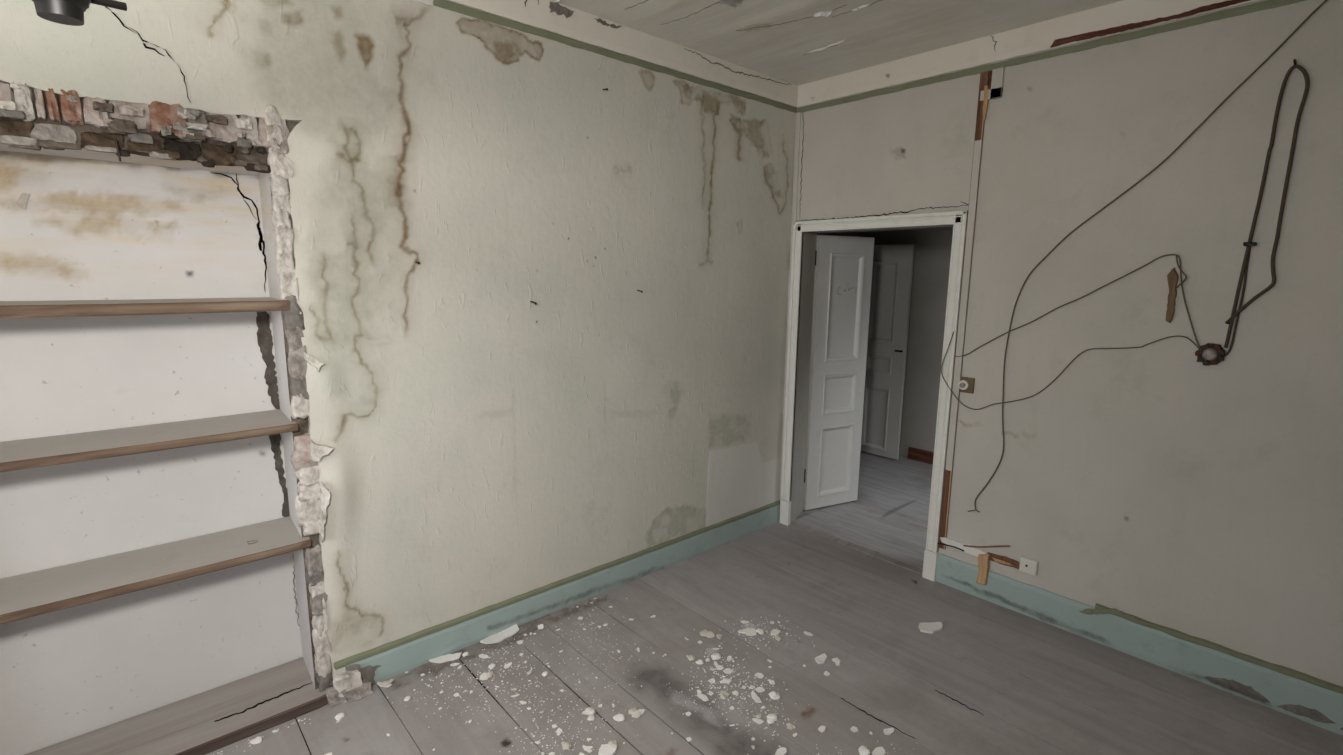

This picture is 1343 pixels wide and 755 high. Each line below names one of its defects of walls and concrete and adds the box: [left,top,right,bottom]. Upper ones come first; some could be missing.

crack [103,6,191,103]
damp [358,37,373,63]
crack [624,0,790,85]
crack [736,0,882,55]
damp [397,52,410,194]
flaking render [0,81,593,755]
flaking render [582,704,645,722]
peeling [1204,676,1343,731]